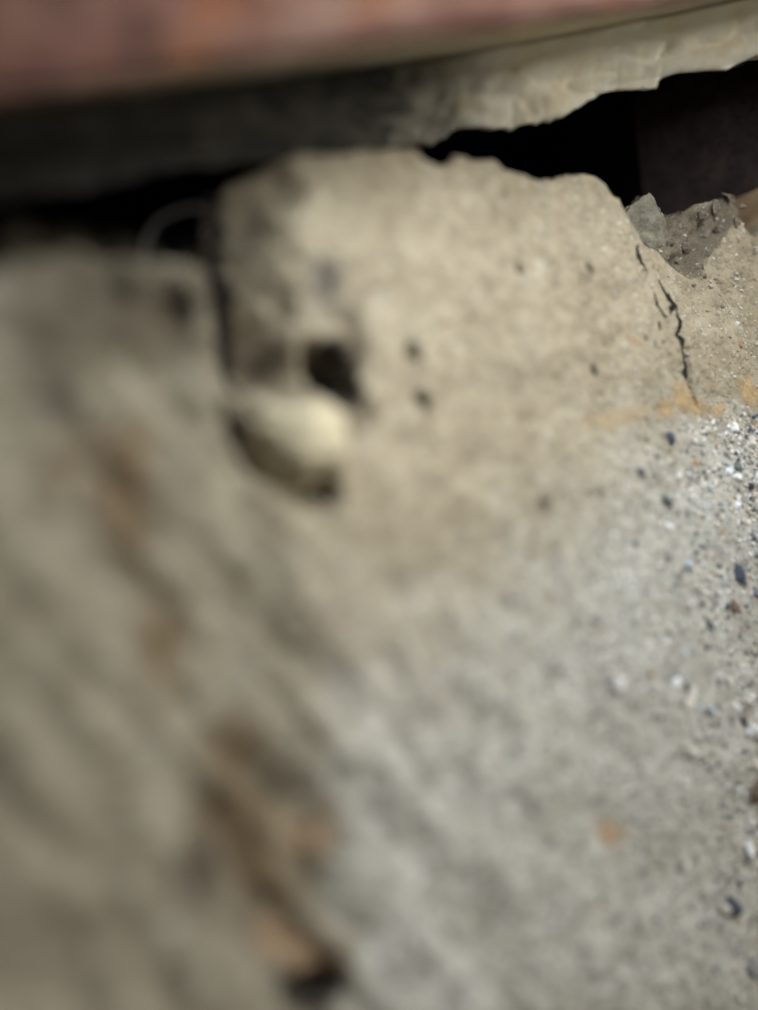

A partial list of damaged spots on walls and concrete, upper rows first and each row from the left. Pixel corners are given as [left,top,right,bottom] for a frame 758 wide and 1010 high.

spalling [643,193,746,287]
crack [636,244,702,415]